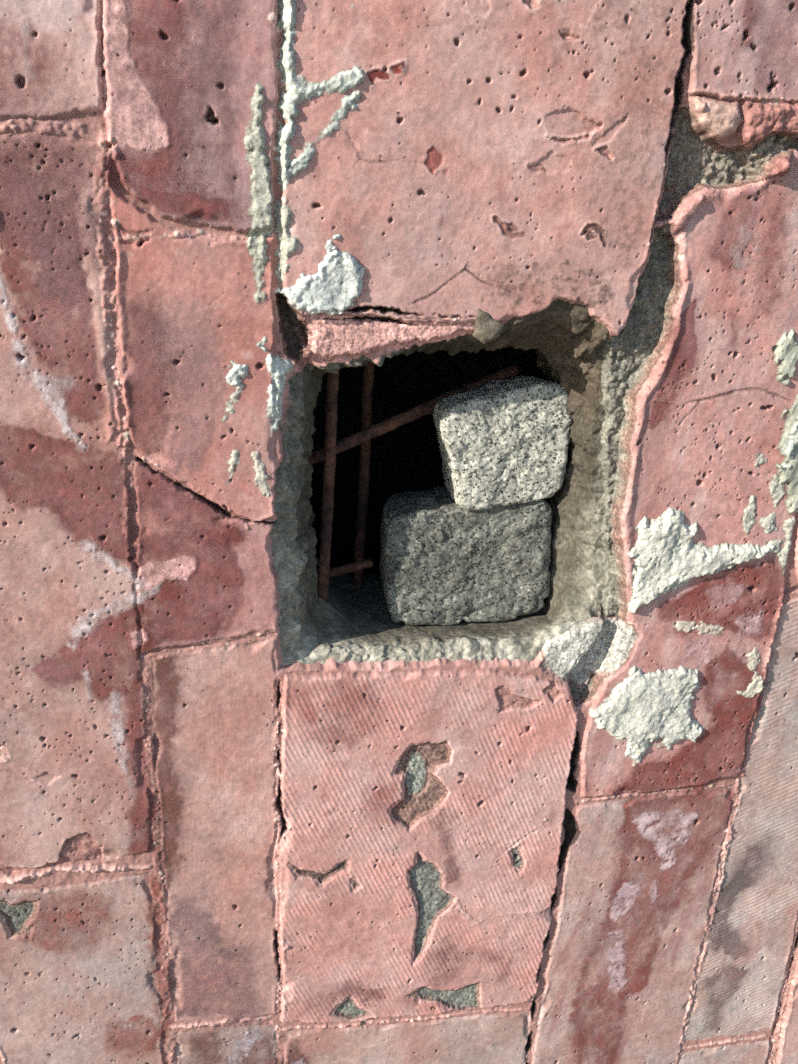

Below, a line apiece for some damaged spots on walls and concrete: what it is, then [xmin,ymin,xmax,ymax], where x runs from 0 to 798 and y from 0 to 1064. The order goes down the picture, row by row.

crack [664,0,695,180]
crack [137,457,276,524]
spalling [225,107,798,710]
leakage [0,142,254,1051]
spalling [391,742,451,828]
spalling [409,854,455,961]
spalling [512,848,523,868]
crack [525,731,581,1064]
leakage [569,563,783,1064]